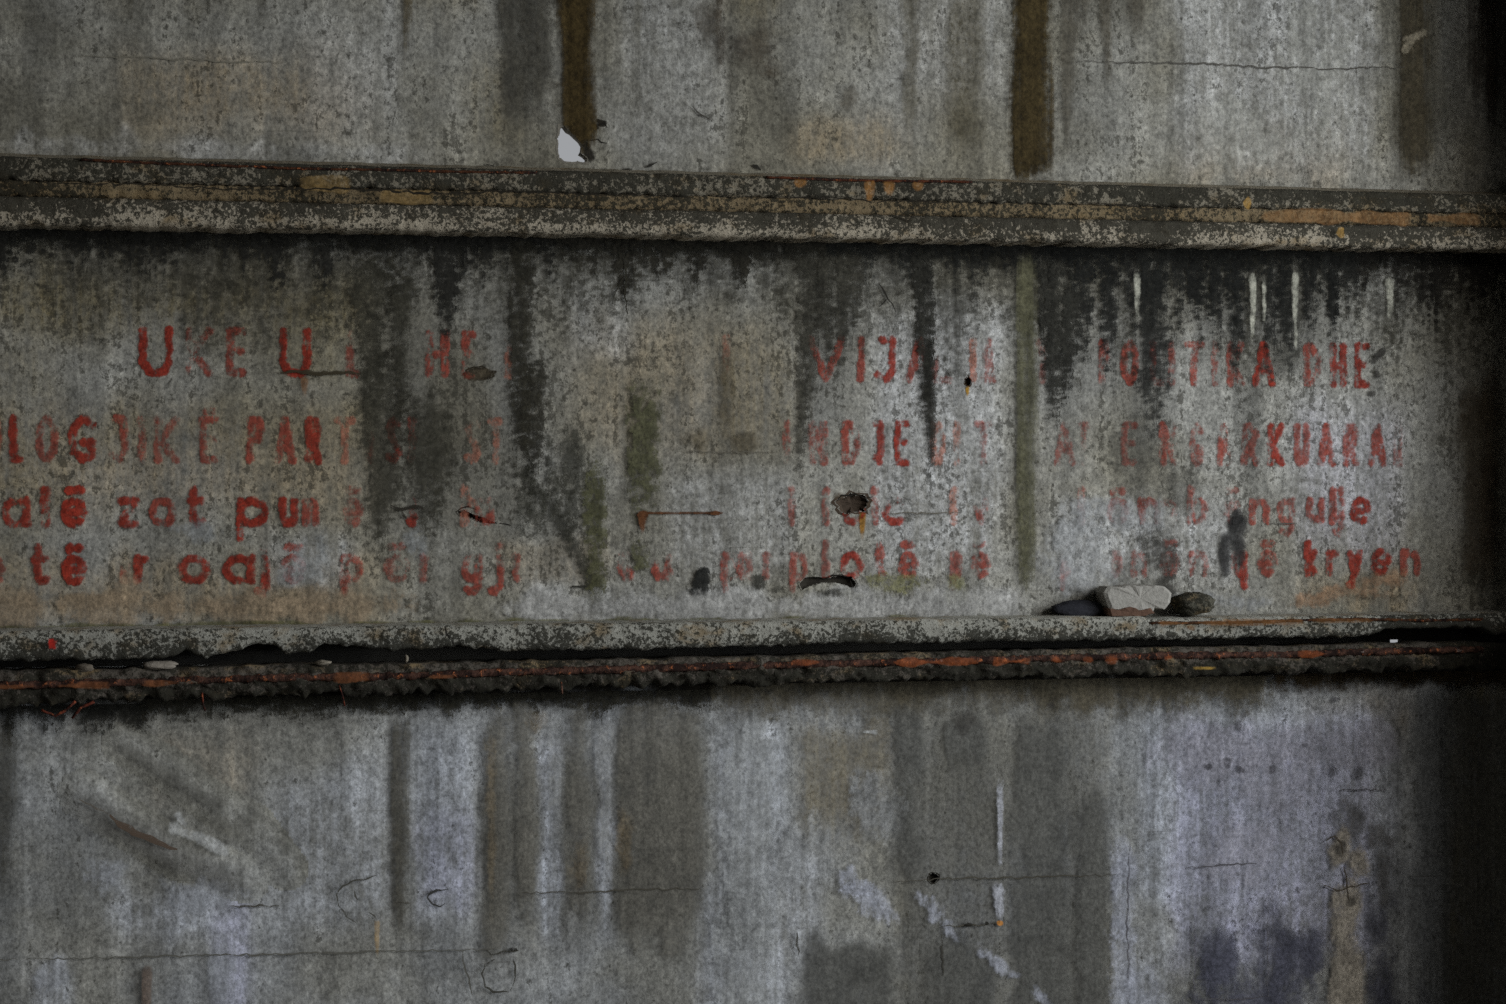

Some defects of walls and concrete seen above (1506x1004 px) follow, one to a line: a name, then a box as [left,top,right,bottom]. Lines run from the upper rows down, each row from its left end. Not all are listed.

damp [501,0,597,152]
damp [1009,0,1055,180]
crack [1075,60,1401,70]
damp [1395,0,1431,174]
damp [0,229,1506,621]
spalling [831,490,873,533]
damp [0,667,1506,1004]